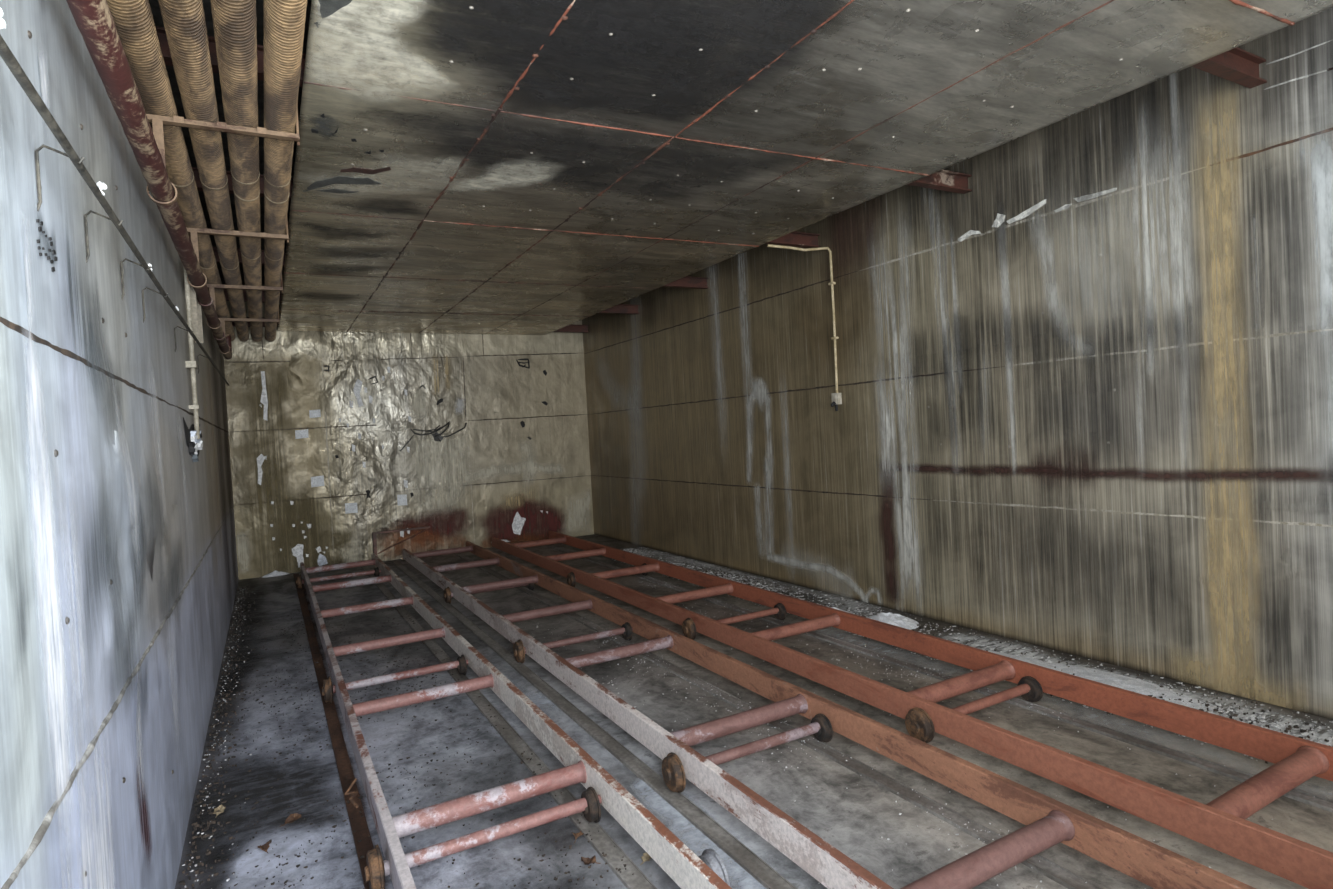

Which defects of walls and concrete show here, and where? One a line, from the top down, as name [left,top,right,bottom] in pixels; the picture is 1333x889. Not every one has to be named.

damp [403,117,768,197]
damp [1080,73,1183,362]
damp [1312,151,1333,317]
damp [999,190,1026,463]
rust [378,509,466,551]
rust [483,496,565,548]
damp [748,380,879,608]
damp [880,390,919,585]
damp [27,344,112,889]
damp [946,635,1115,674]
damp [1171,689,1333,746]
damp [191,760,338,889]